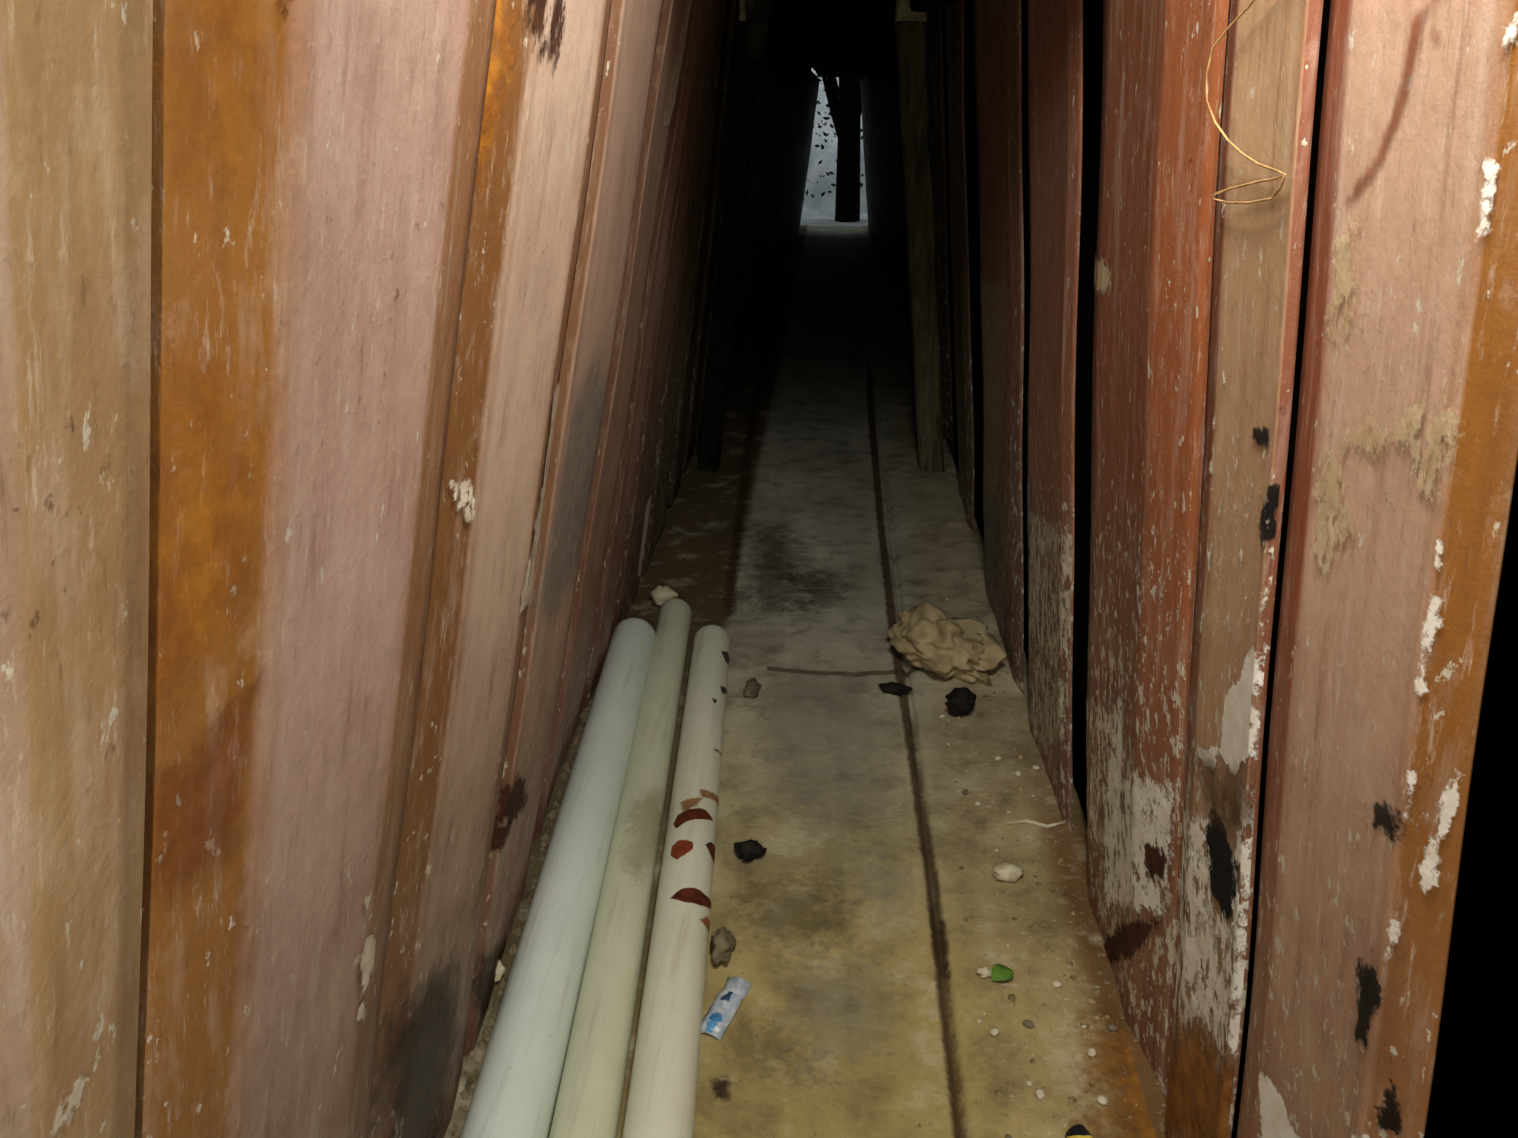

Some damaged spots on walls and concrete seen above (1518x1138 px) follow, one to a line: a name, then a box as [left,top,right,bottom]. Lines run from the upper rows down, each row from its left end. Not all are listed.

peeling [1197,646,1266,776]
spalling [1142,841,1167,884]
spalling [1205,809,1238,920]
spalling [1103,912,1162,966]
peeling [50,1077,86,1136]
peeling [1257,1072,1300,1138]